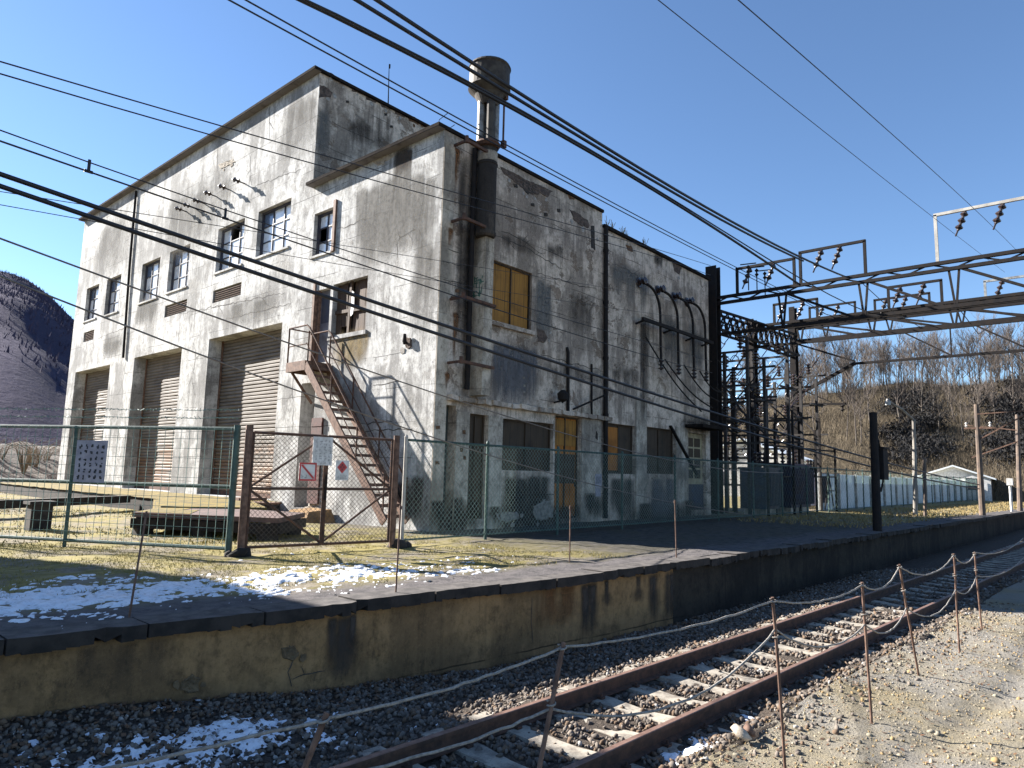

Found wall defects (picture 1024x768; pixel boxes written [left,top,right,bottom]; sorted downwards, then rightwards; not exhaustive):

water stain [319,113,329,145]
spalling [500,167,598,250]
water stain [493,344,536,398]
water stain [582,581,609,624]